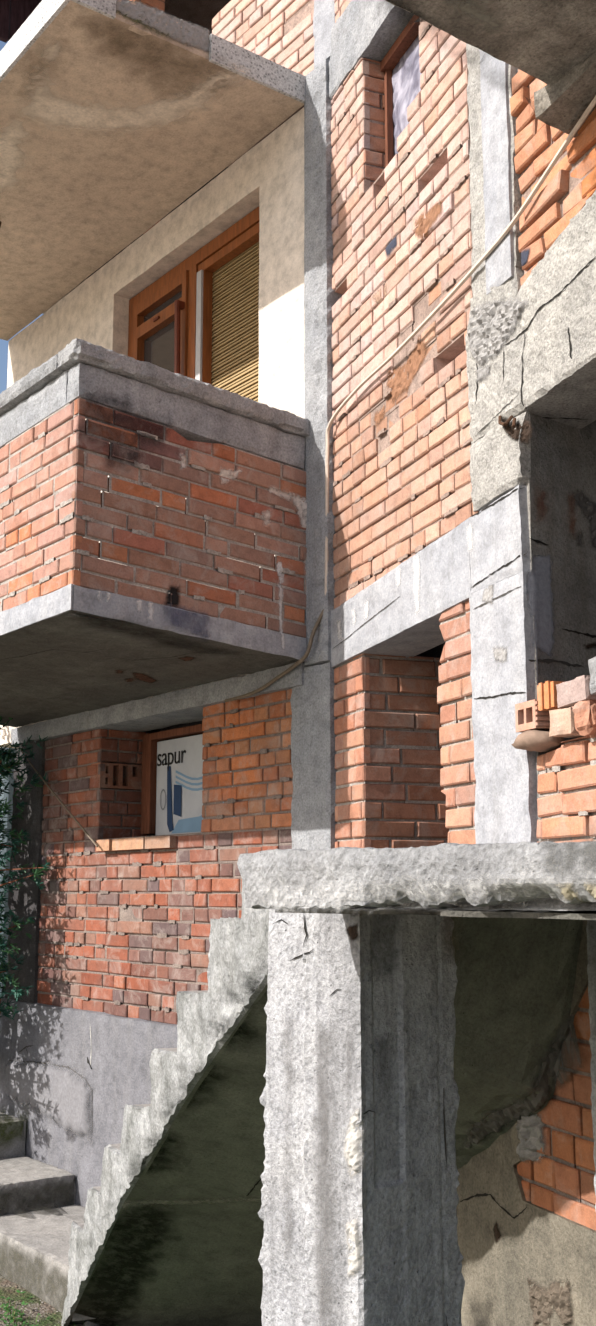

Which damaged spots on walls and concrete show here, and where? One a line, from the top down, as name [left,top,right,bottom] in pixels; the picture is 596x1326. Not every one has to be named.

crack [475,257,596,432]
spalling [498,415,532,442]
peeling [267,879,596,908]
damp [229,975,266,1000]
damp [216,1022,255,1044]
damp [139,1136,176,1171]
damp [0,1182,74,1217]
damp [0,1198,261,1326]